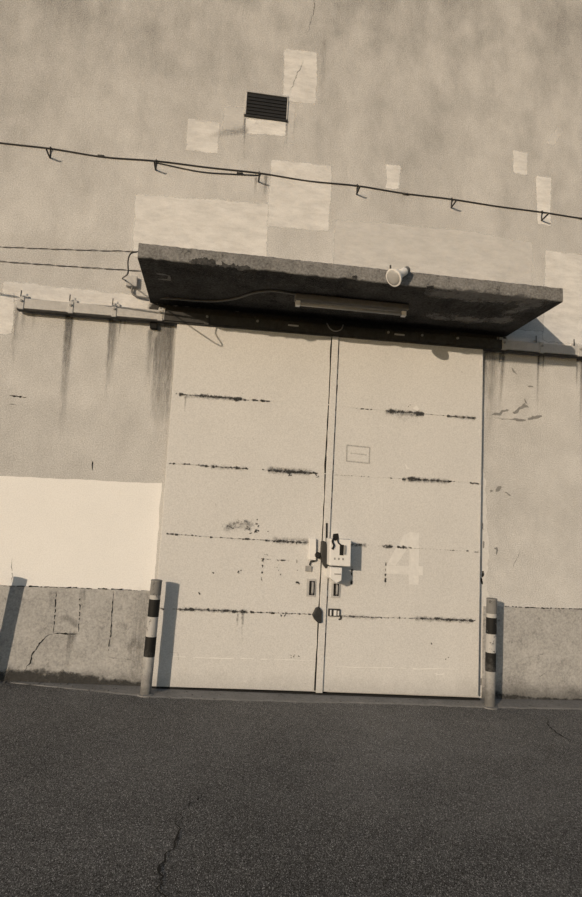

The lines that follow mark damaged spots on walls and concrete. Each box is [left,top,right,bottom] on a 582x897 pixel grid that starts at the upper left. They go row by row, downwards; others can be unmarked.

rust [176,393,270,402]
rust [262,468,319,478]
rust [166,519,309,544]
crack [11,562,145,670]
rust [177,608,311,618]
crack [157,792,208,897]